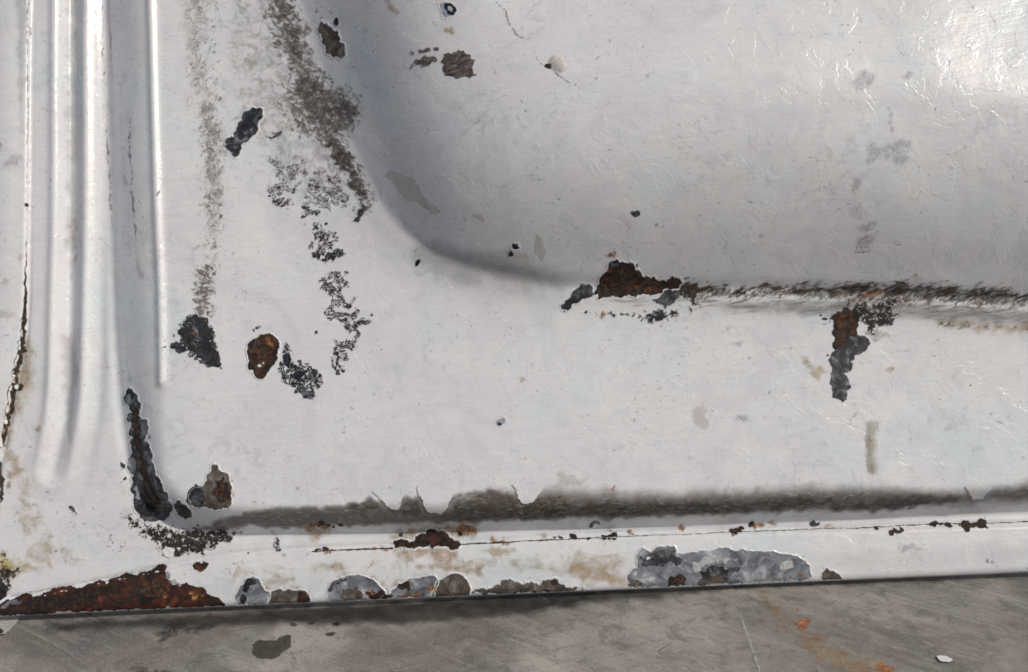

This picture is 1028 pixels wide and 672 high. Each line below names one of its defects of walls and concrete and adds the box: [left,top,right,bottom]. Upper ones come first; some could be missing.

peeling [315,7,354,69]
peeling [223,106,266,160]
crack [0,240,28,448]
peeling [156,264,222,369]
rust [806,289,909,402]
rust [0,453,19,503]
peeling [120,386,234,524]
peeling [350,482,488,515]
rust [0,564,225,616]
peeling [233,575,312,606]
peeling [325,526,473,602]
peeling [625,544,844,589]